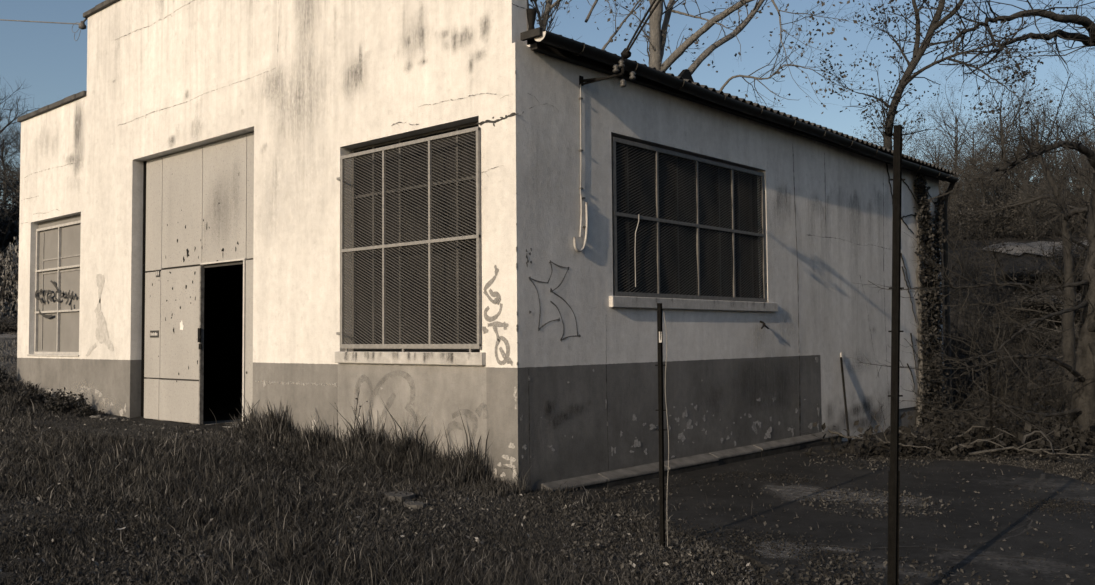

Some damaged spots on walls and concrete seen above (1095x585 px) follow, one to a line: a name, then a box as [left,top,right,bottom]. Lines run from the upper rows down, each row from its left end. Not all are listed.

crack [392,88,535,126]
peeling [494,443,531,488]